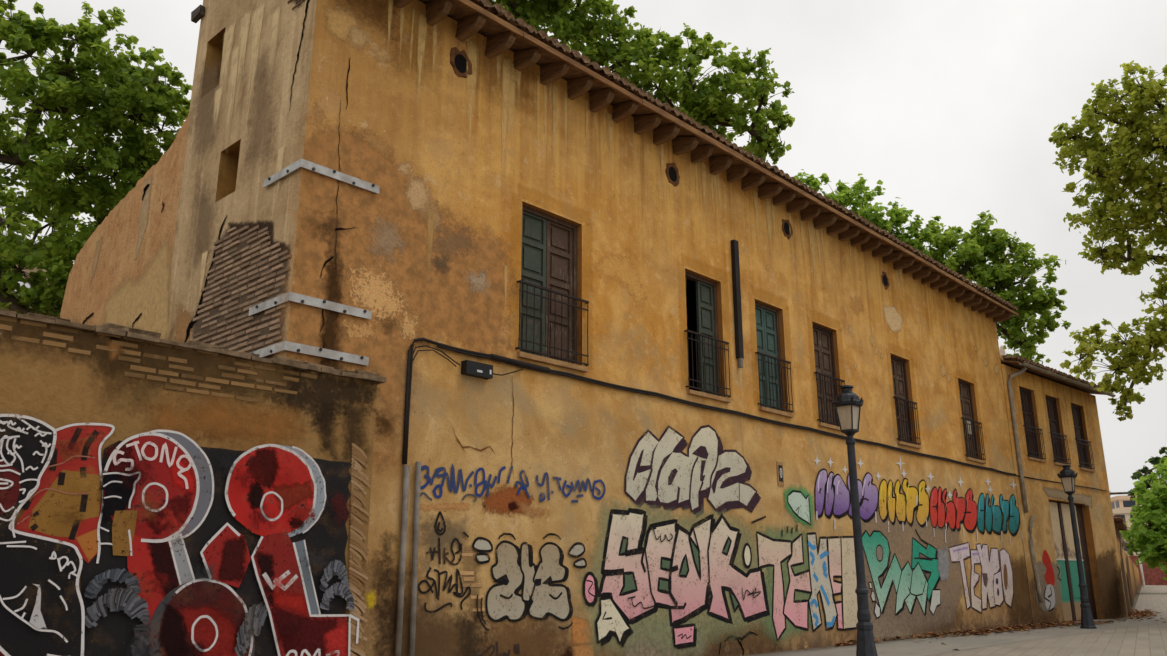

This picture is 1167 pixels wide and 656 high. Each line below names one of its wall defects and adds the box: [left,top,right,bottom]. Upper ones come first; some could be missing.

crack [289,0,309,111]
peeling [324,6,391,62]
crack [320,57,355,369]
peeling [0,102,514,464]
crack [453,384,514,474]
spalling [484,485,545,518]